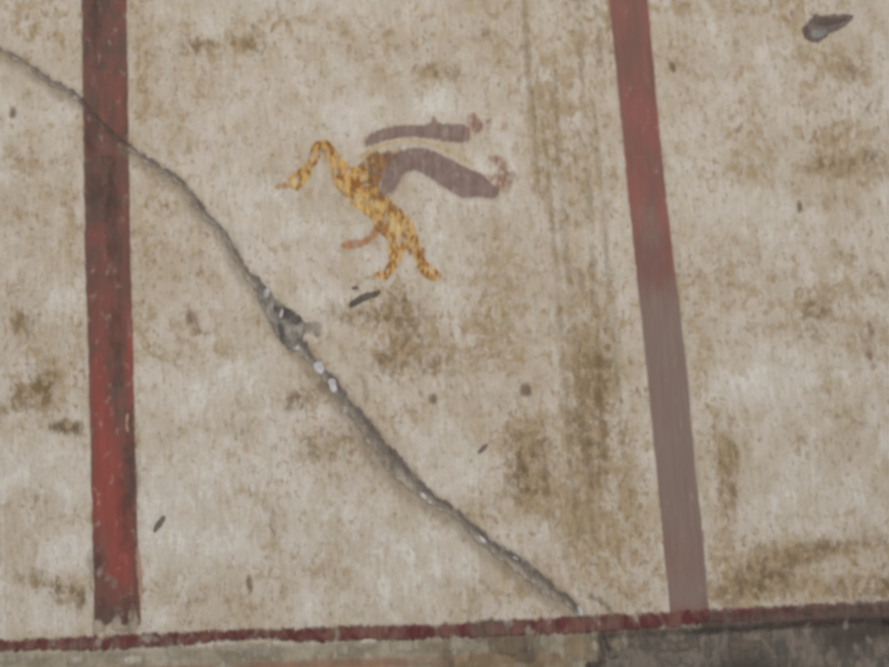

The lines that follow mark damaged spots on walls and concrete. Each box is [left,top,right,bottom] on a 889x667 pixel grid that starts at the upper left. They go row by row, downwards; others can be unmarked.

crack [0,48,613,618]